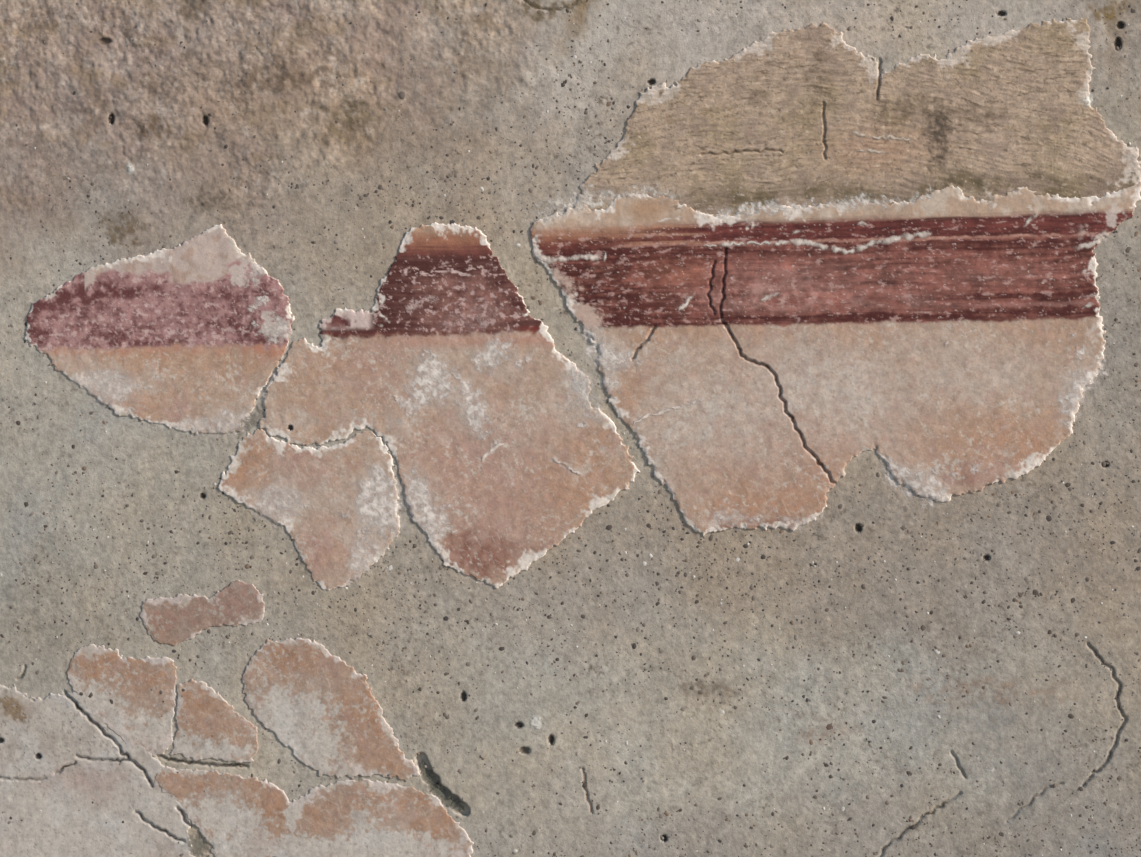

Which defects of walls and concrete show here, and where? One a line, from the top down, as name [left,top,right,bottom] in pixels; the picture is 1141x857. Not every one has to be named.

spalling [574,17,1141,208]
peeling [248,296,292,343]
peeling [395,350,501,445]
peeling [567,327,642,428]
crack [707,257,831,480]
peeling [342,464,457,585]
peeling [883,458,948,506]
crack [62,696,243,783]
spalling [188,834,214,857]
spalling [422,762,464,811]
crack [882,802,947,850]
crack [1089,648,1125,778]